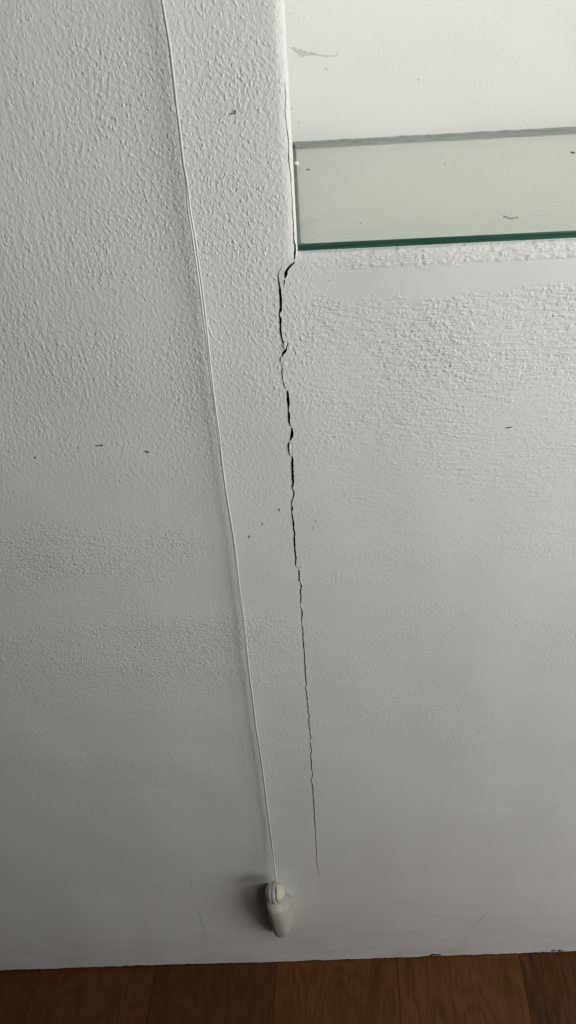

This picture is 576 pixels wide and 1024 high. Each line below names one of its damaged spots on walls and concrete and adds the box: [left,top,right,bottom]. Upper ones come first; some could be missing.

crack [277,82,319,876]